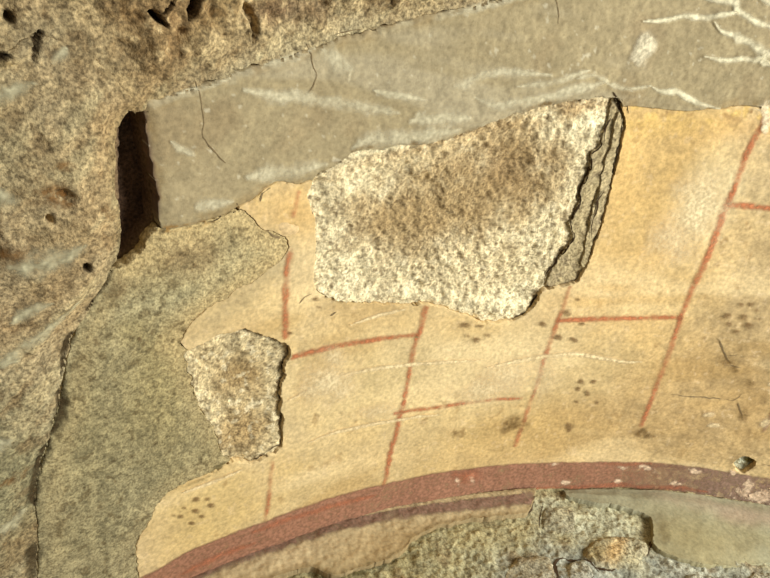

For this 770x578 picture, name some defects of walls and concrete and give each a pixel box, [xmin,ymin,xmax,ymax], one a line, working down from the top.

leakage [631,33,657,65]
flaking render [307,97,623,321]
flaking render [183,328,288,461]